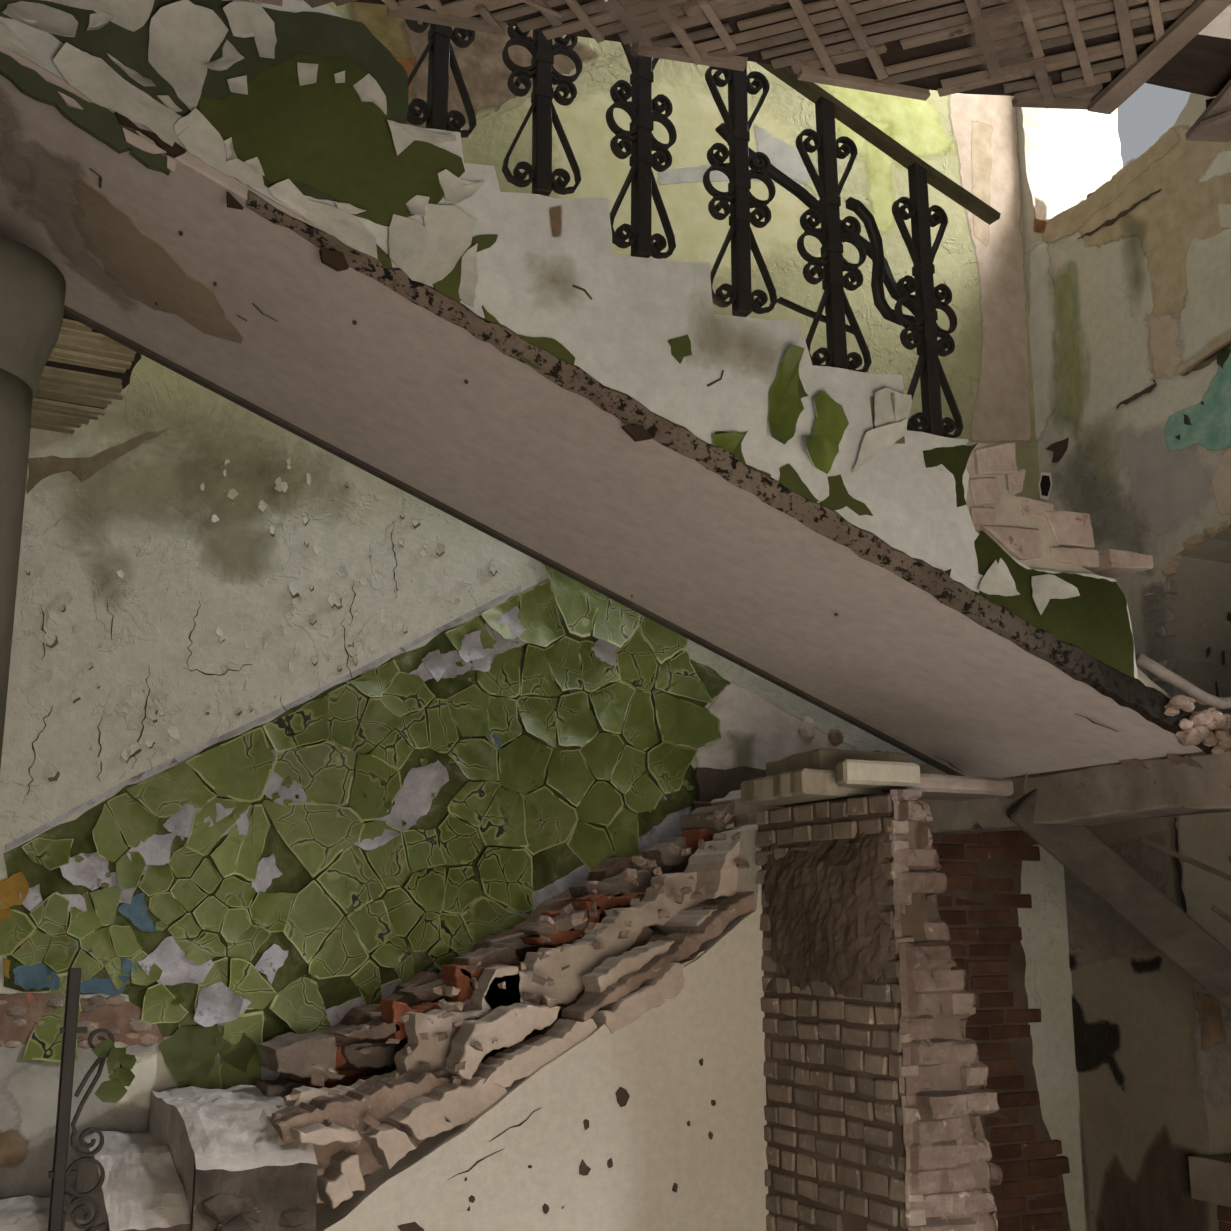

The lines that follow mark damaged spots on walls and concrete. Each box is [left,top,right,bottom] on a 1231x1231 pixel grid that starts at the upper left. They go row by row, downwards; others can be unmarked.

peeling [0,0,501,325]
flaking render [1034,125,1231,380]
damp [1054,267,1086,426]
damp [1217,347,1231,369]
damp [77,409,316,572]
damp [1056,414,1207,554]
crack [183,601,252,676]
crack [341,580,356,677]
crack [27,705,53,795]
crack [132,670,151,768]
peeling [0,563,858,1103]
flaking render [889,789,1071,1231]